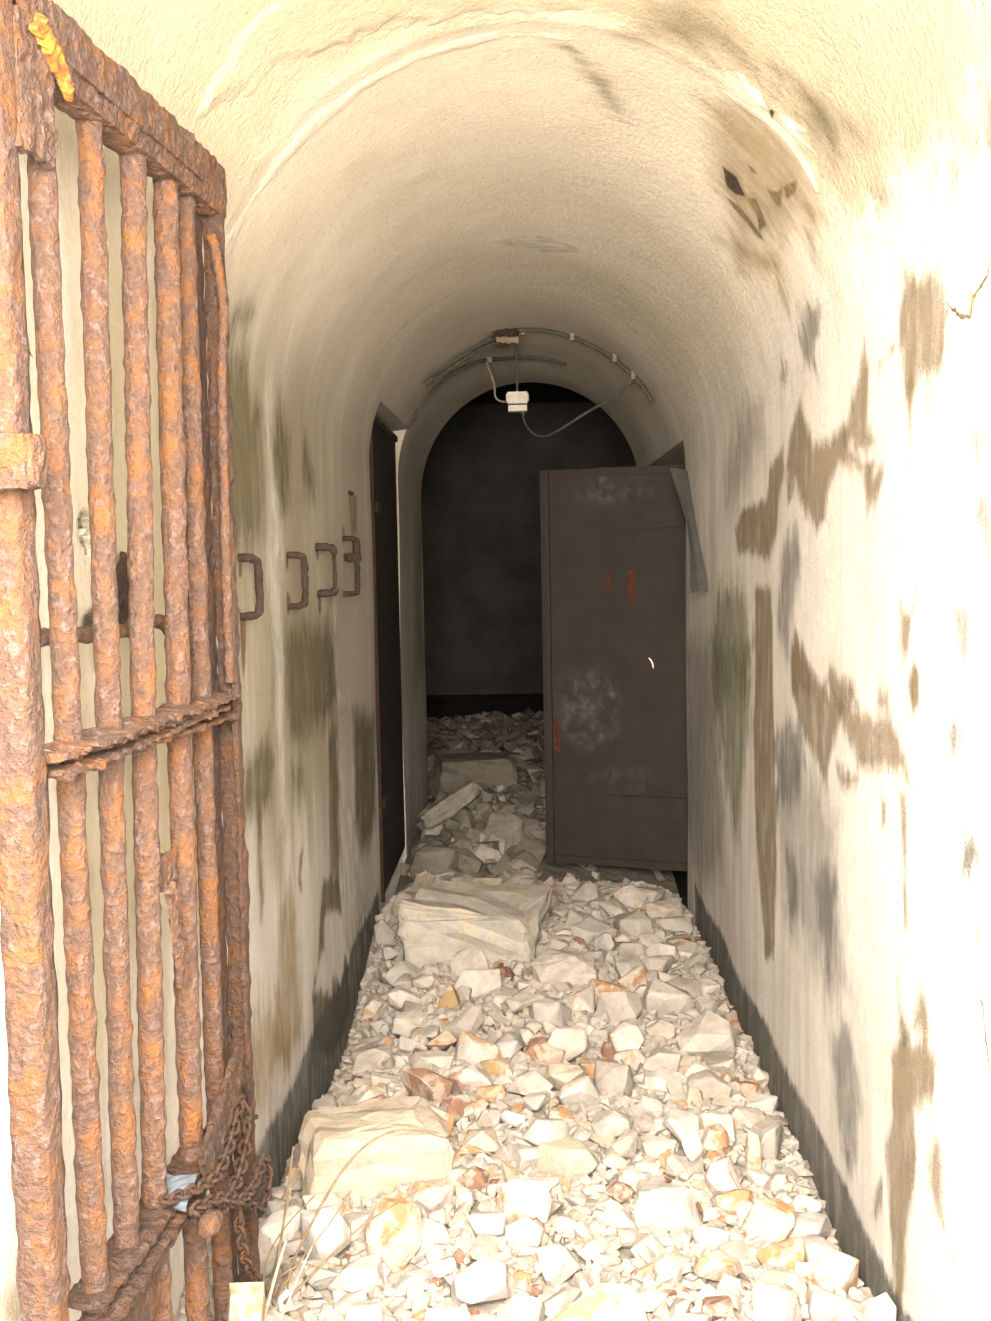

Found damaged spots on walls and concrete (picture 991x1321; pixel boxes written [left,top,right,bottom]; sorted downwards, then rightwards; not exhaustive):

peeling [718,72,818,240]
water stain [800,307,818,369]
water stain [892,275,948,412]
crack [947,257,991,330]
water stain [714,345,906,959]
water stain [900,605,918,712]
water stain [230,356,380,1218]
water stain [695,885,934,1321]
water stain [931,1143,941,1212]